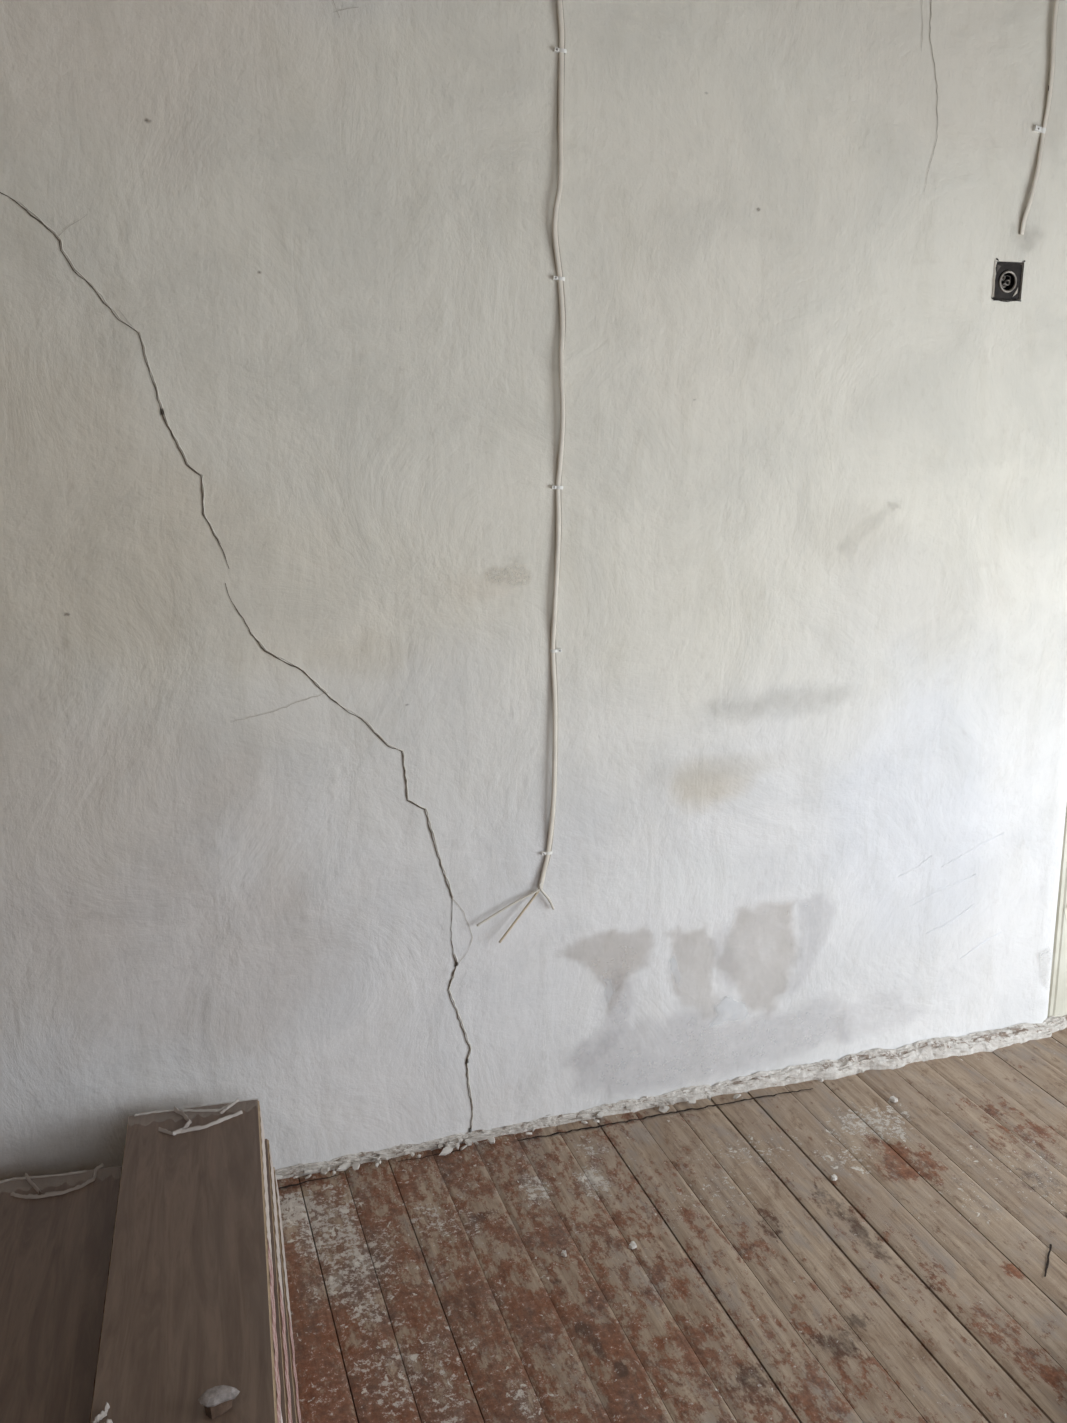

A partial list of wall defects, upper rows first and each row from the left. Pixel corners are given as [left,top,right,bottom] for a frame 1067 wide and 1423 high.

crack [0,192,473,1133]